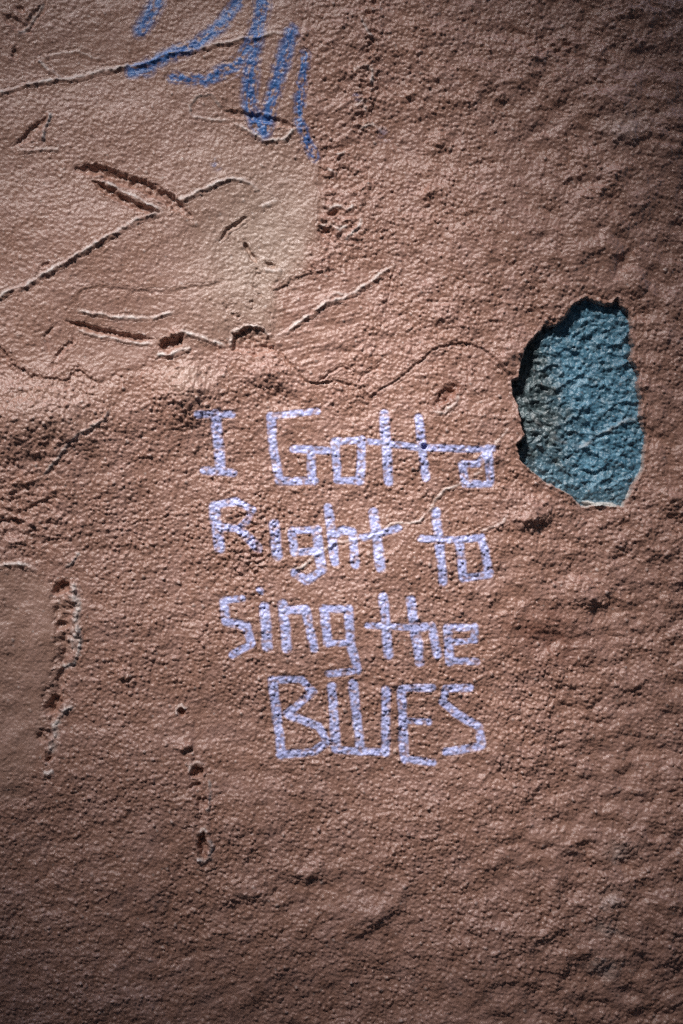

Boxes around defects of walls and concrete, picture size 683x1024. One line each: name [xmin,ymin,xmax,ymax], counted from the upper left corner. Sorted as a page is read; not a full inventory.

crack [277,338,512,401]
spalling [506,292,652,513]